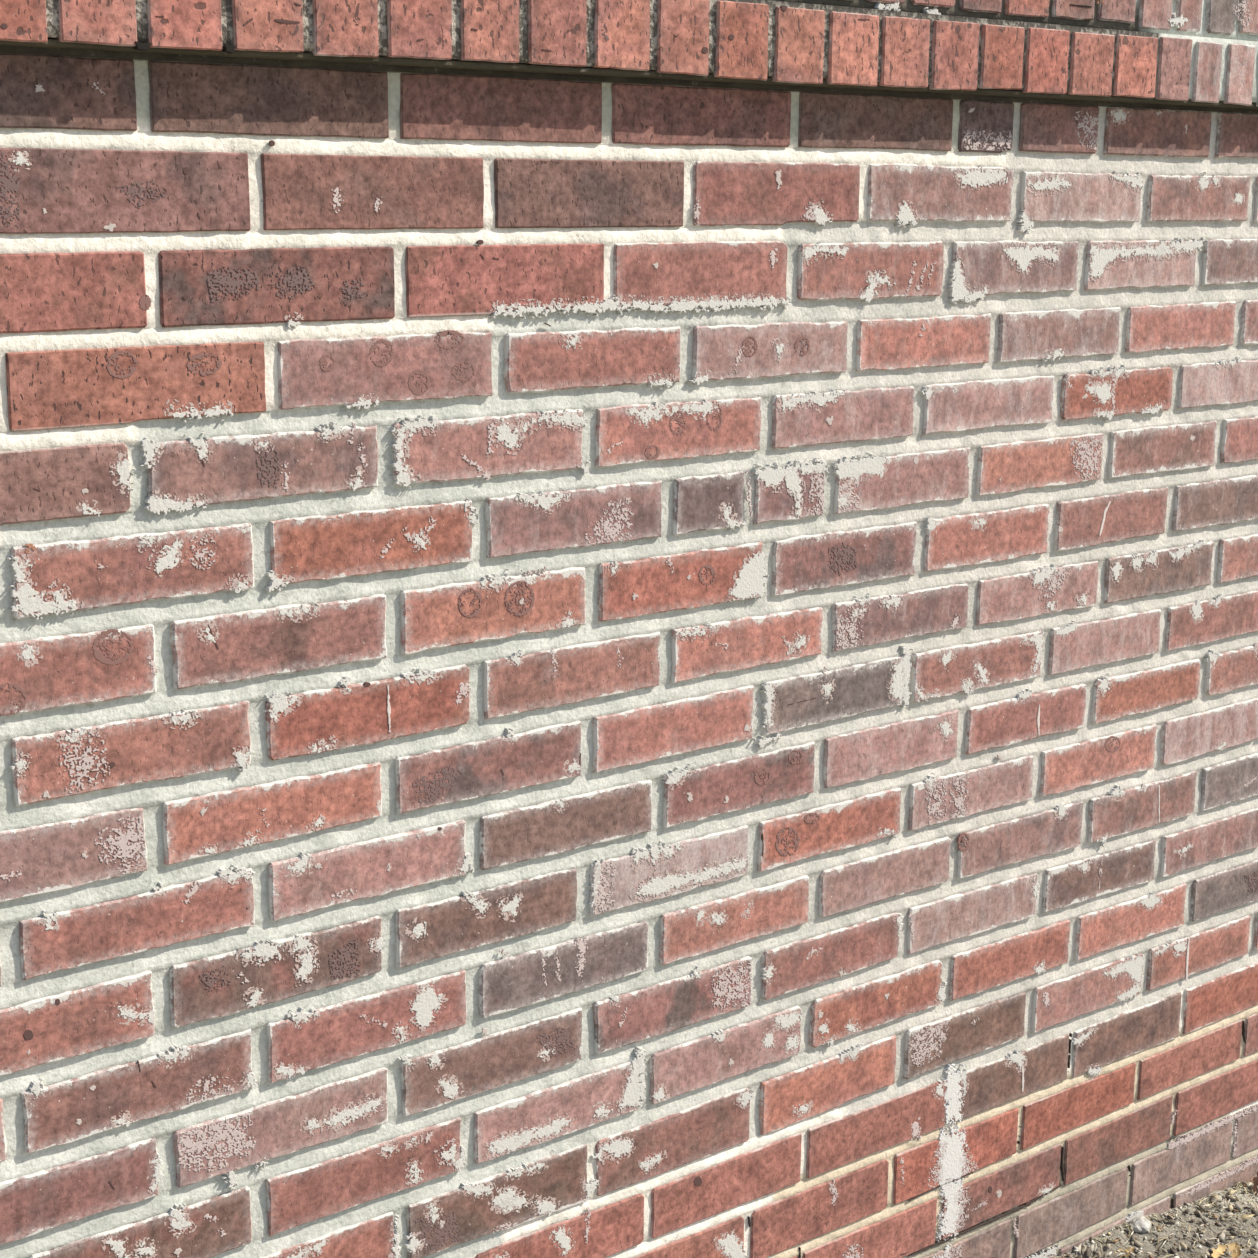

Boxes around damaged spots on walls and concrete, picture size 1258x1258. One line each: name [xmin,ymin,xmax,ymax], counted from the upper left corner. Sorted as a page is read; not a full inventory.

damp [256,447,290,494]
damp [347,422,368,467]
damp [461,419,497,480]
damp [380,516,436,563]
damp [453,682,471,706]
damp [412,765,462,806]
damp [182,881,203,904]
damp [328,938,360,979]
damp [539,936,588,986]
damp [910,1117,922,1141]
damp [932,1063,988,1258]
damp [414,1210,462,1254]